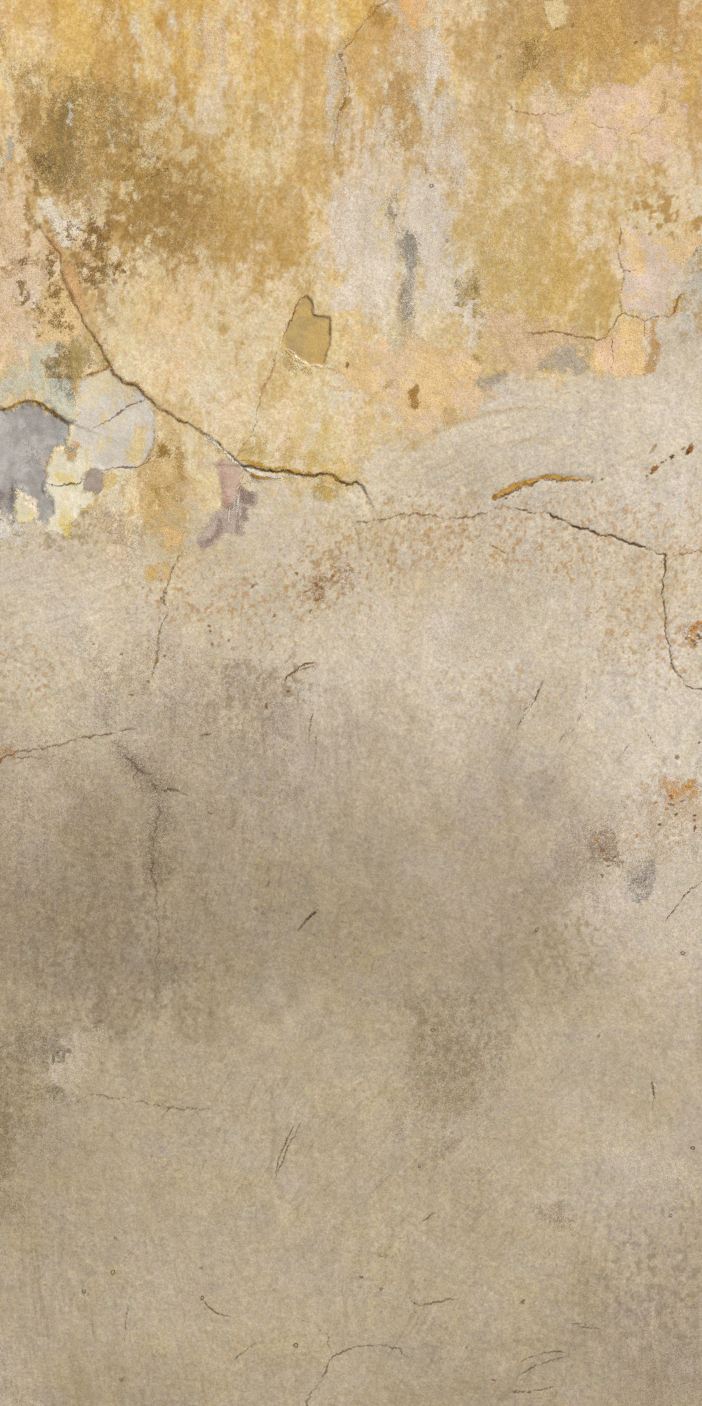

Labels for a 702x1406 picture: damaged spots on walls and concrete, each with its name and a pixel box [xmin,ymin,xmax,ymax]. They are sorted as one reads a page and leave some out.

water stain [477,0,702,116]
peeling [0,136,112,371]
peeling [103,244,123,293]
water stain [0,0,240,423]
water stain [302,0,605,391]
spalling [0,368,157,525]
spalling [142,457,259,582]
crack [42,227,702,689]
crack [1,728,187,1013]
water stain [0,603,361,1251]
water stain [506,794,656,923]
water stain [392,965,517,1174]